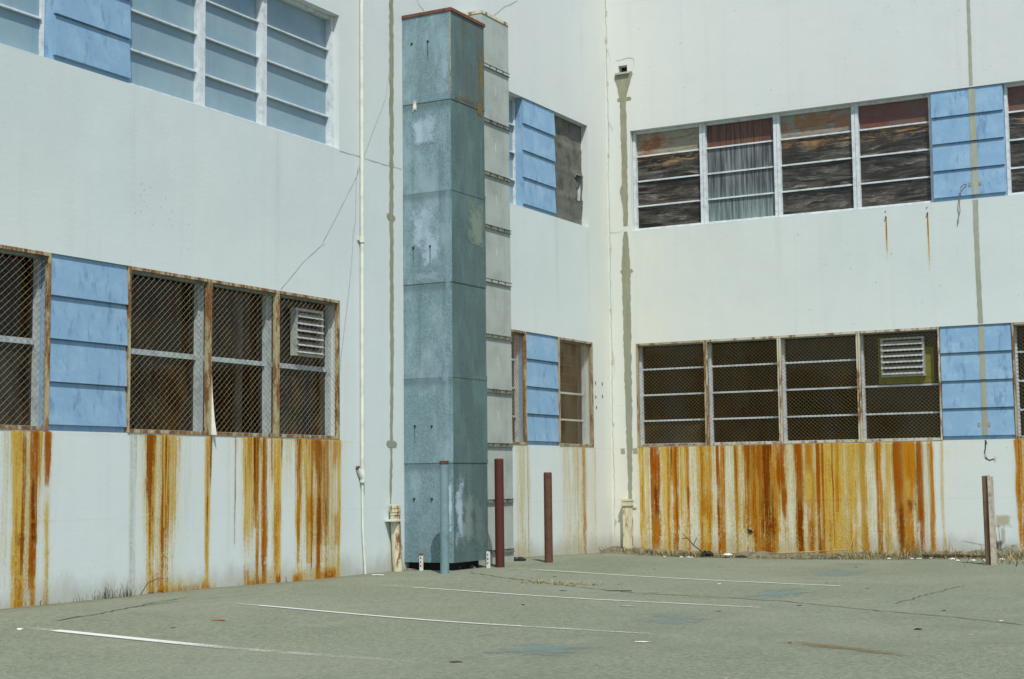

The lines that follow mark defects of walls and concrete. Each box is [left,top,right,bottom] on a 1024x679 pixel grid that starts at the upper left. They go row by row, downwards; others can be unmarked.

rust [11,430,52,608]
rust [145,434,213,594]
rust [234,436,341,585]
rust [638,441,946,554]